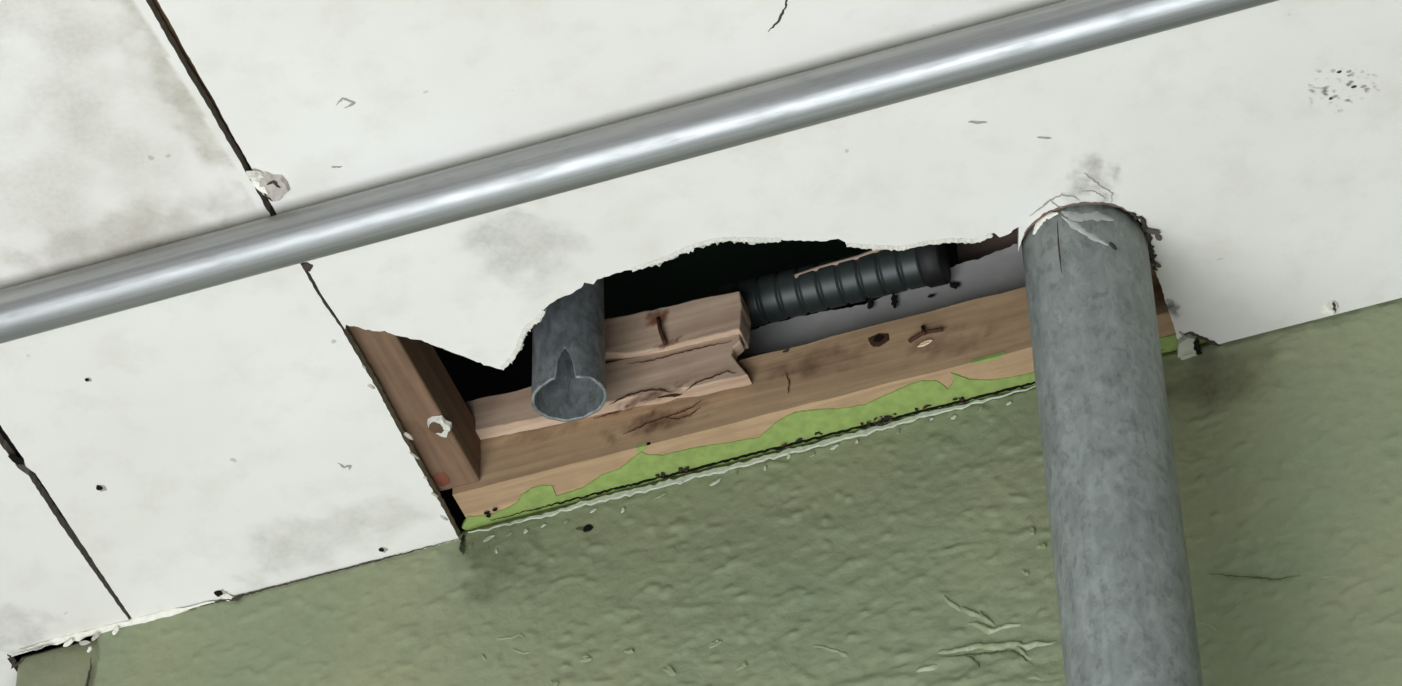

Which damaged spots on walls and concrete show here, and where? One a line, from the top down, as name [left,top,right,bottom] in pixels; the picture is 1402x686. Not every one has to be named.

crack [1030,173,1114,216]
peeling [468,385,1036,554]
crack [946,650,1034,668]